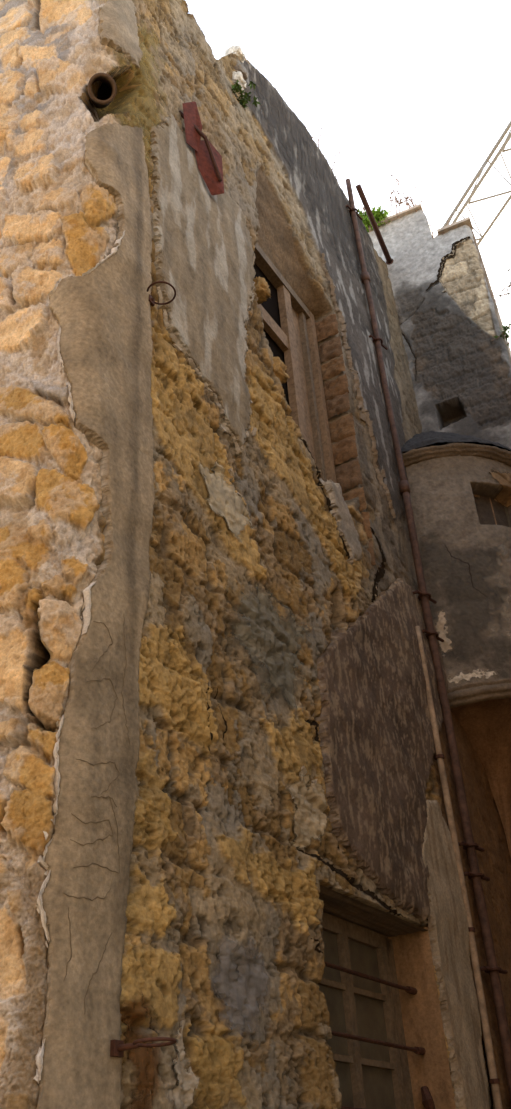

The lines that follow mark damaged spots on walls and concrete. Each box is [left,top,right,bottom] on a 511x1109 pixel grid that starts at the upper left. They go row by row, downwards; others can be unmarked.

flaking render [82,231,125,276]
crack [63,619,130,1014]